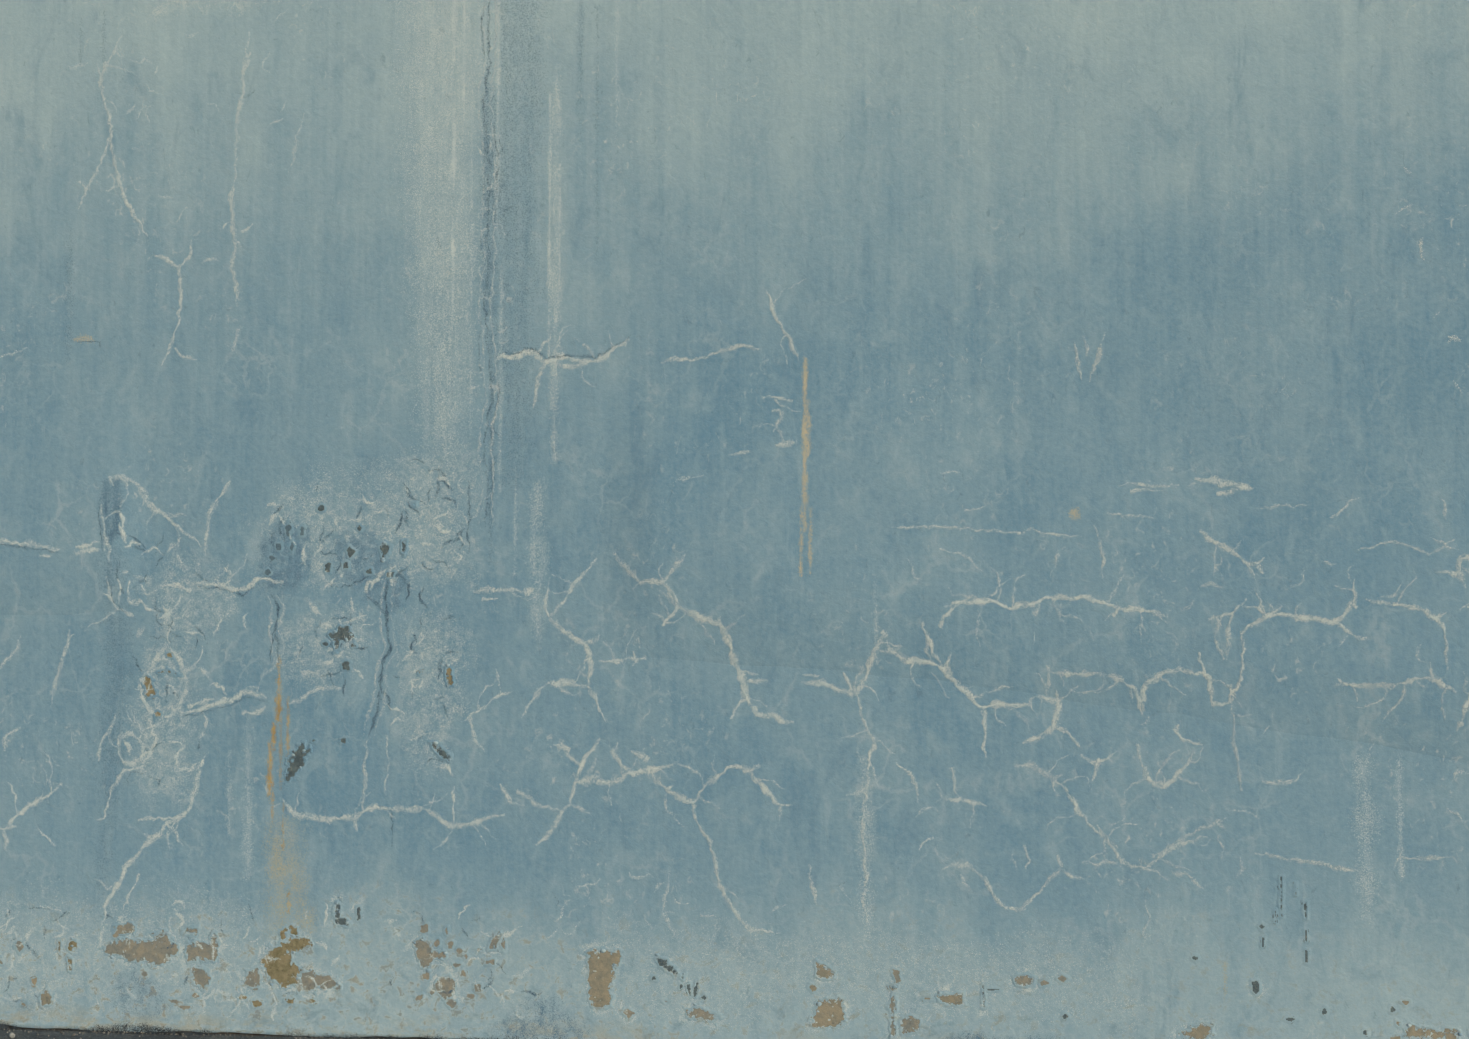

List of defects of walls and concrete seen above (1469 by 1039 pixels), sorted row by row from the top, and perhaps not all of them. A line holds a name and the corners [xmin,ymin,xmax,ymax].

corrosion [797,357,814,577]
spalling [262,503,327,580]
spalling [322,522,410,581]
crack [0,2,803,1021]
crack [801,475,1469,922]
peeling [56,918,227,992]
peeling [234,922,343,1010]
peeling [409,921,509,1011]
peeling [576,939,641,1032]
peeling [647,950,728,1034]
peeling [804,952,856,1039]